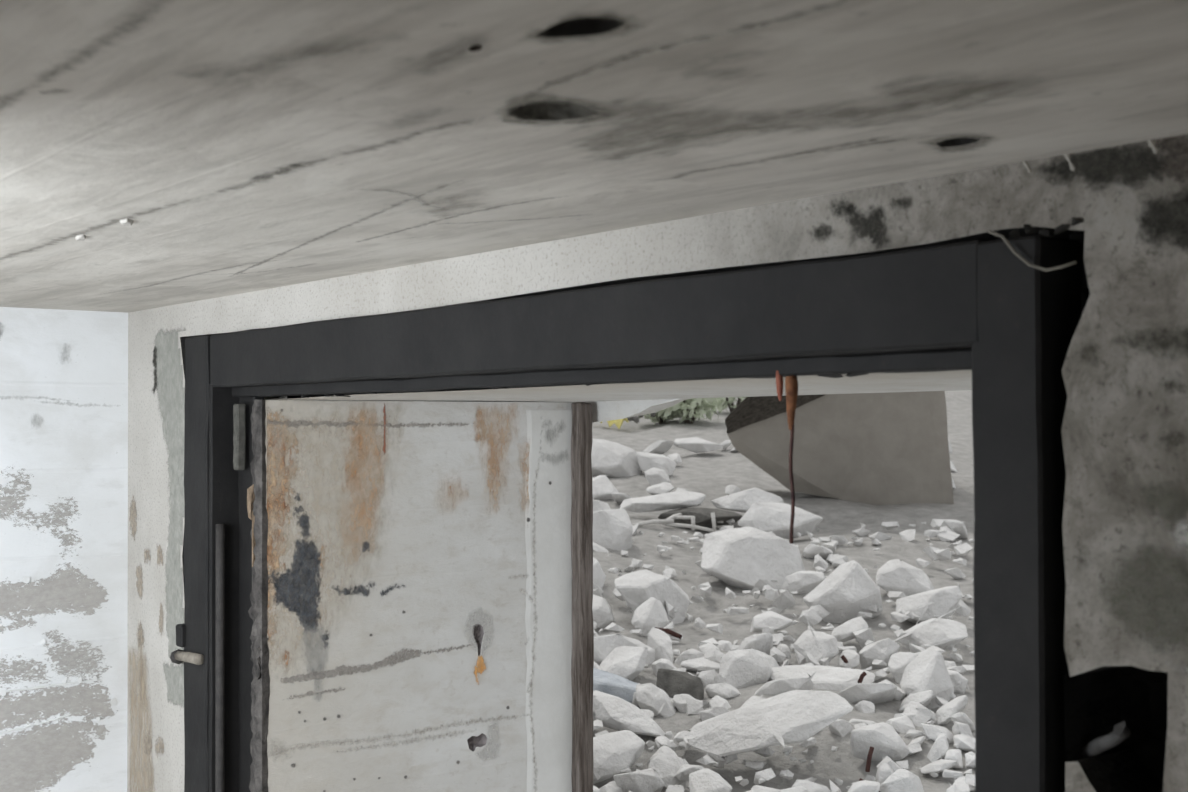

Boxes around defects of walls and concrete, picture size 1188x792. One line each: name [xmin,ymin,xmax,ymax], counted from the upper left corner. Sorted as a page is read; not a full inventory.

spalling [536,15,633,41]
spalling [504,95,608,124]
damp [814,226,831,240]
damp [832,198,911,248]
damp [1040,136,1188,249]
corrosion [267,412,299,646]
damp [269,496,405,648]
peeling [0,466,118,792]